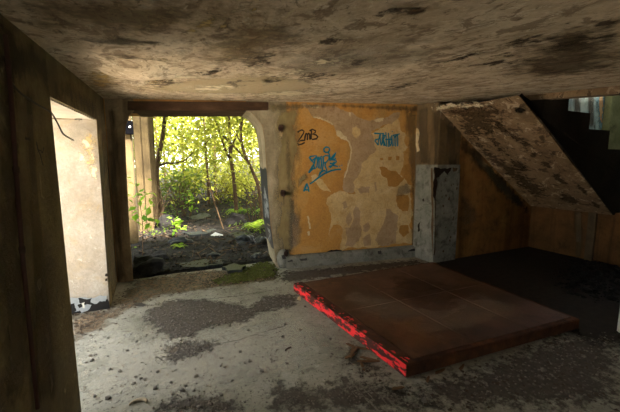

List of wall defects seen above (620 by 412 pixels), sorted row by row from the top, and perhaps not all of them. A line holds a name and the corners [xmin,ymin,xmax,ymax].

damp [512,22,620,76]
damp [588,96,605,129]
peeling [301,103,420,254]
damp [448,121,528,212]
peeling [70,295,110,314]